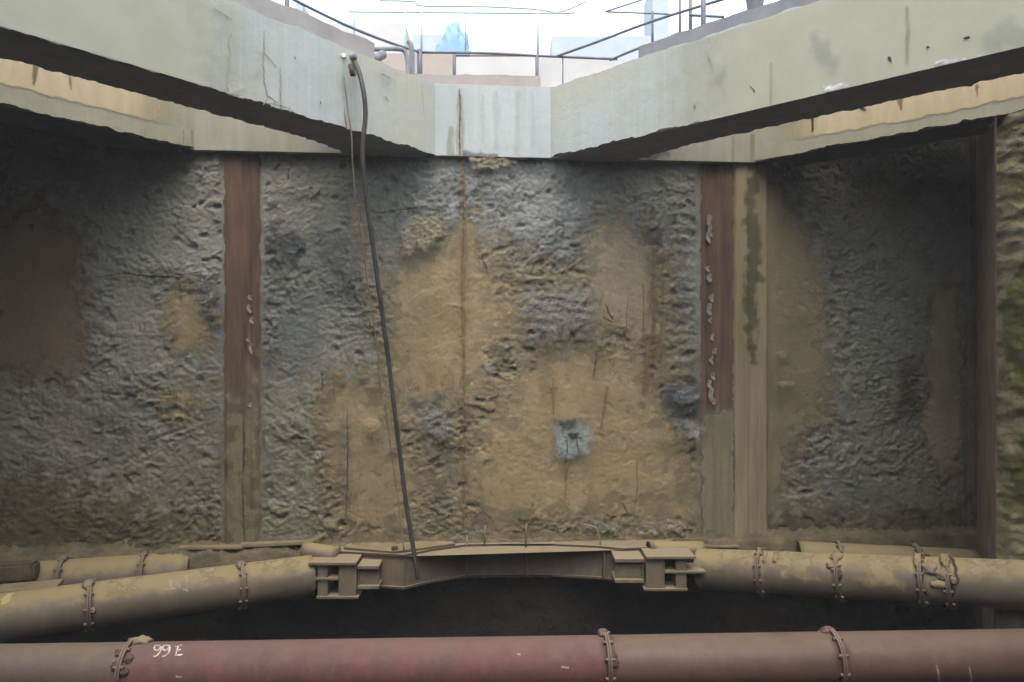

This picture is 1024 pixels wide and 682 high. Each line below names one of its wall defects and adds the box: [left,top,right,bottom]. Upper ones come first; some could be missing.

spalling [555,418,592,459]